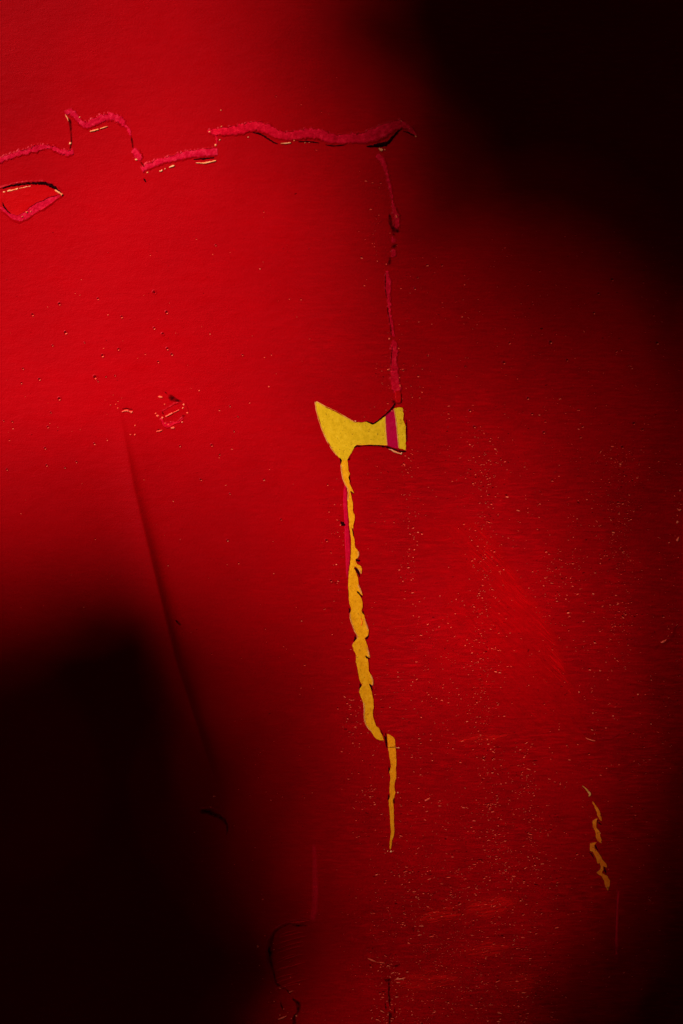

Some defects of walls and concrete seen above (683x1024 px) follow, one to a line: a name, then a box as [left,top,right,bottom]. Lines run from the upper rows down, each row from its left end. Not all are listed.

crack [0,107,418,403]
peeling [315,401,407,852]